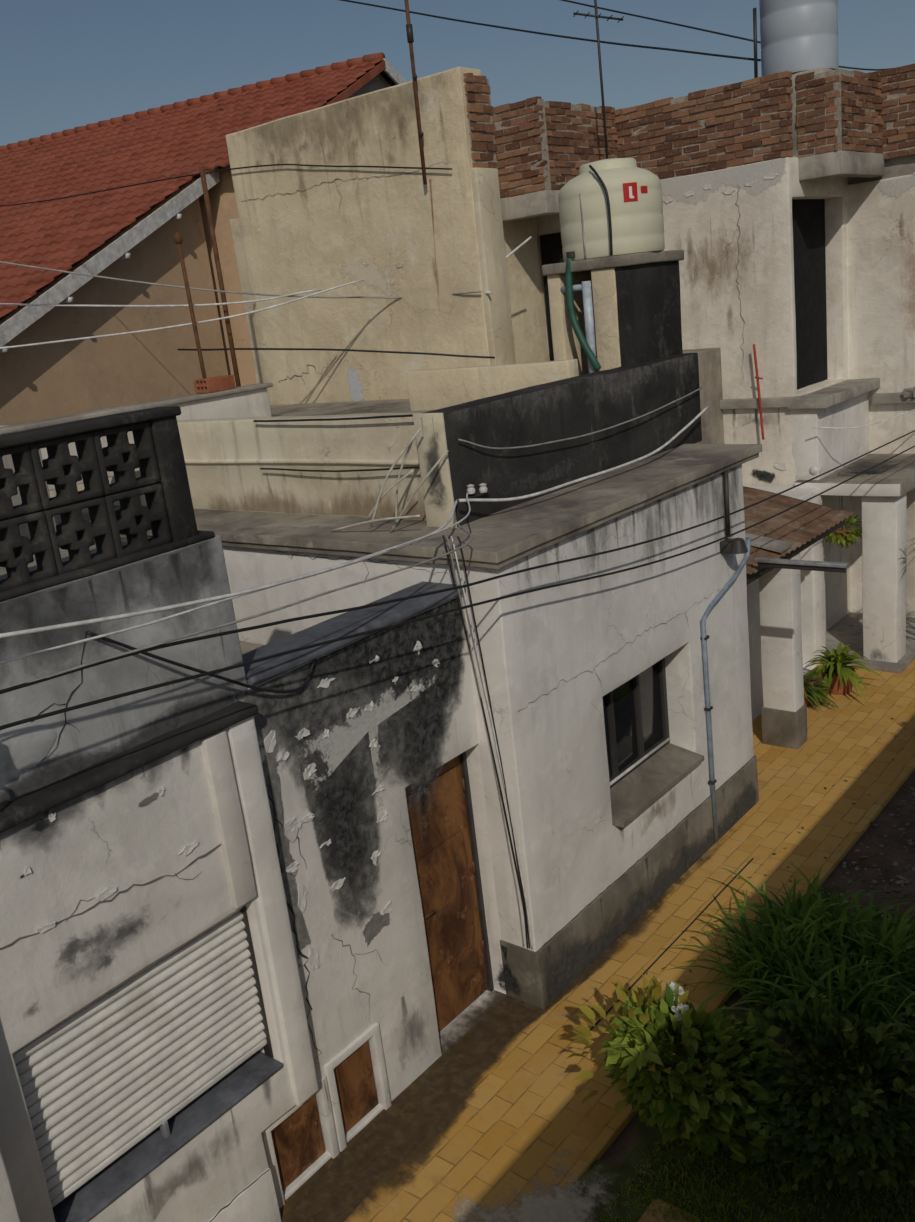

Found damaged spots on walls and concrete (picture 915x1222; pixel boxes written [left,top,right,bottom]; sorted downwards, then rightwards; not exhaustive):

peeling [660,158,785,204]
crack [725,185,745,373]
crack [31,631,87,761]
leakage [0,597,464,921]
leakage [66,921,140,965]
crack [0,841,221,950]
peeling [258,659,440,1054]
crack [331,934,387,1020]